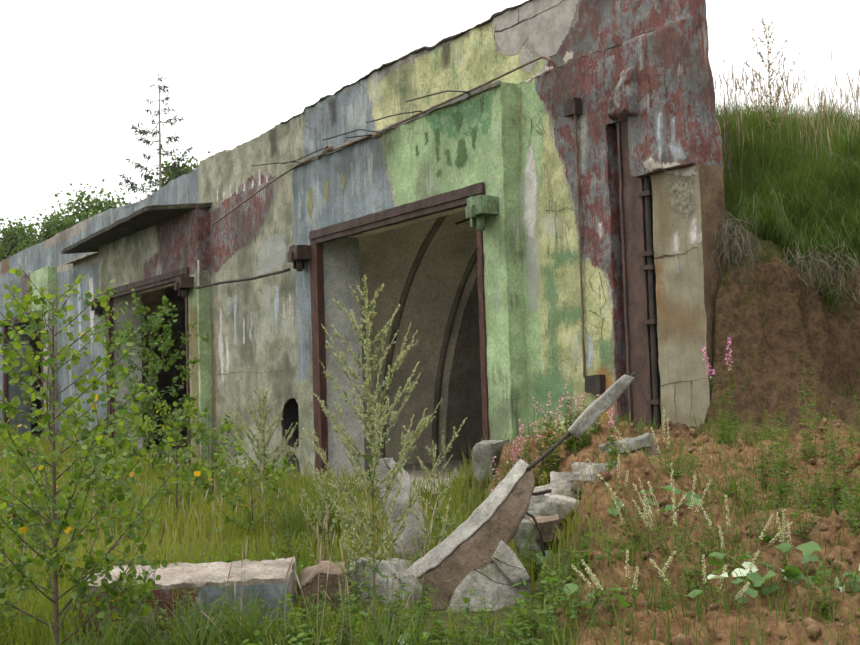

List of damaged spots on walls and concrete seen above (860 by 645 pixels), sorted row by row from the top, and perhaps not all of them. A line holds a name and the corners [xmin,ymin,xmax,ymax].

crack [491,0,563,53]
peeling [492,0,578,83]
crack [654,247,698,261]
crack [661,378,706,413]